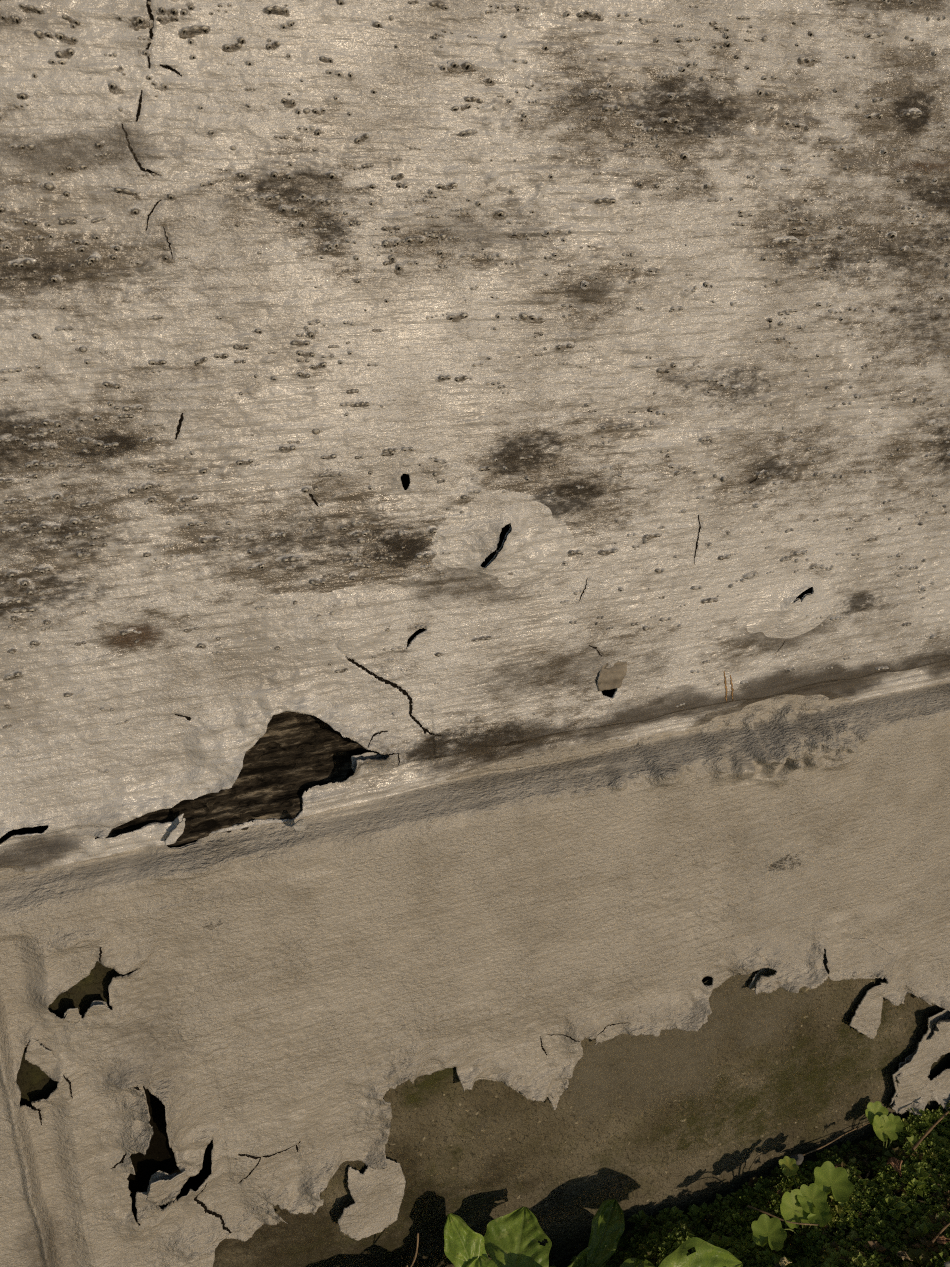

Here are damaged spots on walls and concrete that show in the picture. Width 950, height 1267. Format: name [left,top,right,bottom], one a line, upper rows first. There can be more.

crack [121,0,182,259]
leakage [631,80,733,136]
leakage [896,92,934,133]
leakage [916,179,950,213]
leakage [375,537,427,567]
crack [345,656,436,765]
peeling [95,711,393,848]
peeling [48,962,136,1023]
peeling [16,1038,59,1109]
peeling [200,938,950,1267]
peeling [127,1086,213,1220]